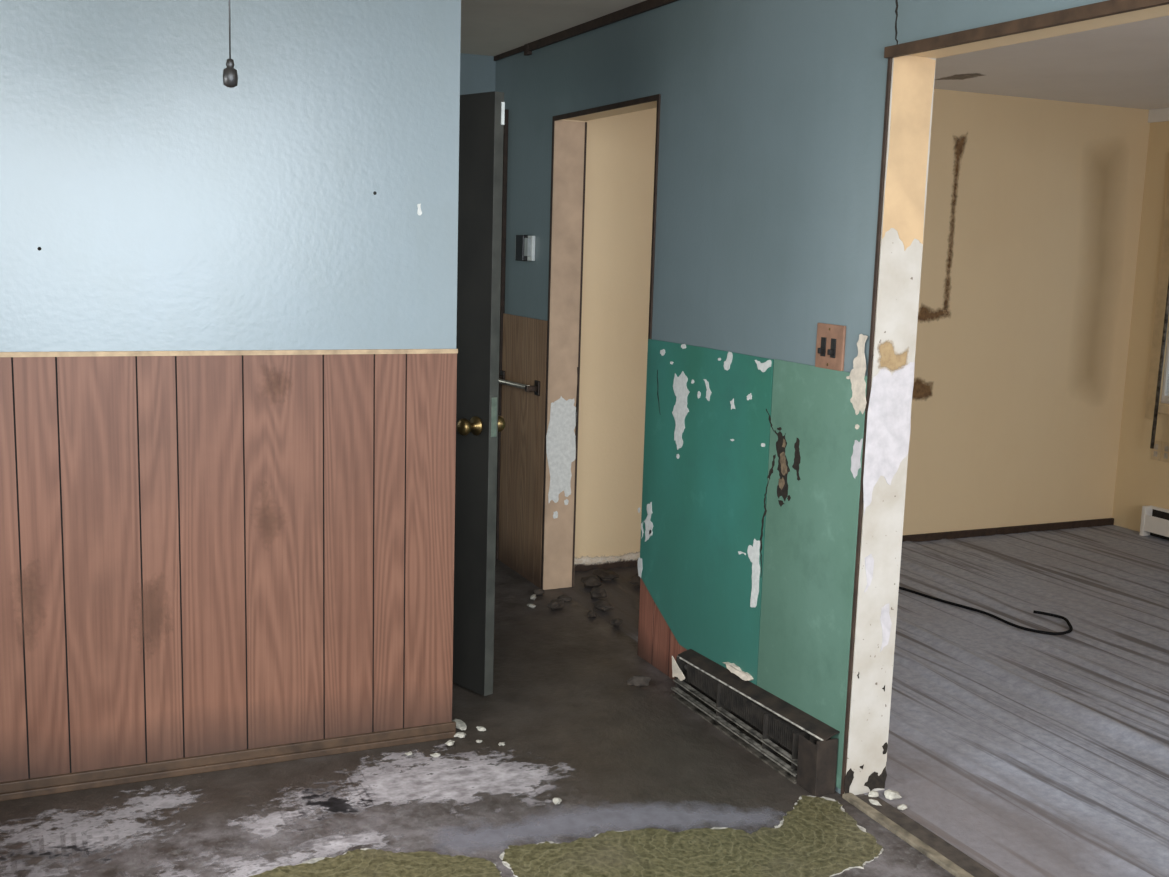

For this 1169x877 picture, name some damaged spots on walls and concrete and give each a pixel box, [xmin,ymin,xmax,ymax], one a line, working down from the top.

peeling [546,396,576,519]
peeling [660,349,712,459]
peeling [718,352,733,371]
peeling [755,360,772,372]
peeling [846,334,915,513]
peeling [738,539,760,607]
crack [760,479,770,575]
leakage [0,786,201,877]
leakage [152,744,770,877]
spalling [844,742,907,810]